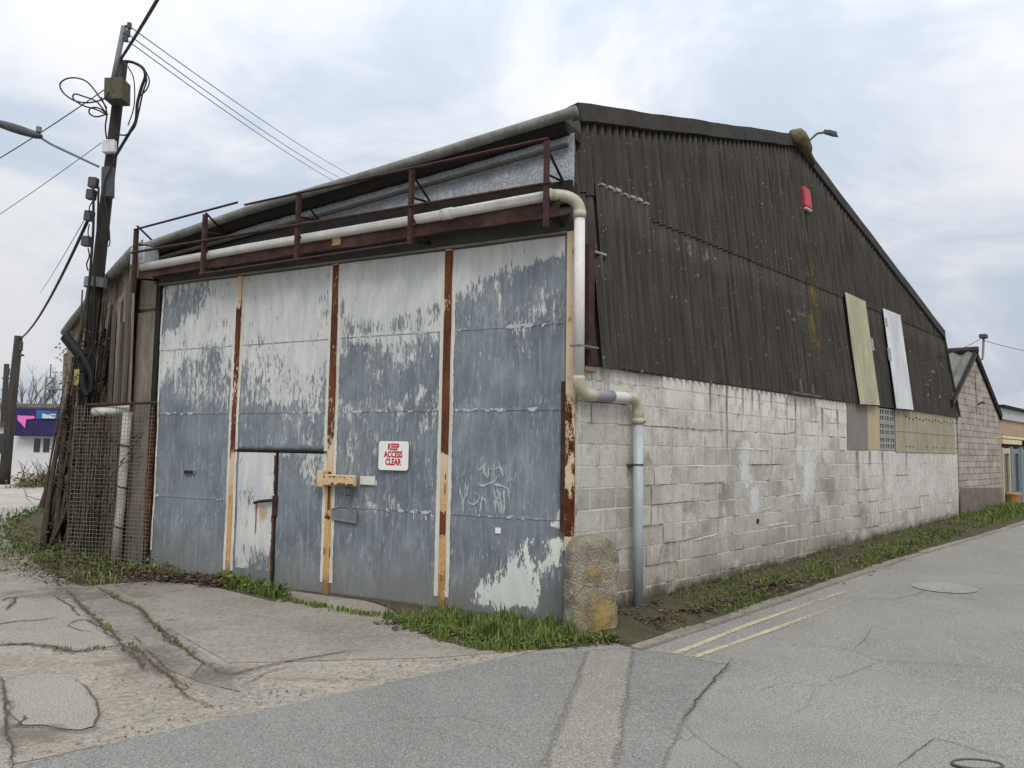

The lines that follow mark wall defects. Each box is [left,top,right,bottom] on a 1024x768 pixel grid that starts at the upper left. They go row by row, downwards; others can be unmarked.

corrosion [230,300,242,455]
corrosion [327,264,339,448]
peeling [160,236,565,571]
corrosion [441,250,453,455]
corrosion [323,472,353,520]
corrosion [564,393,576,537]
leakage [737,438,760,515]
leakage [795,443,818,505]
peeling [471,509,564,613]
crack [0,589,379,707]
crack [1,676,100,764]